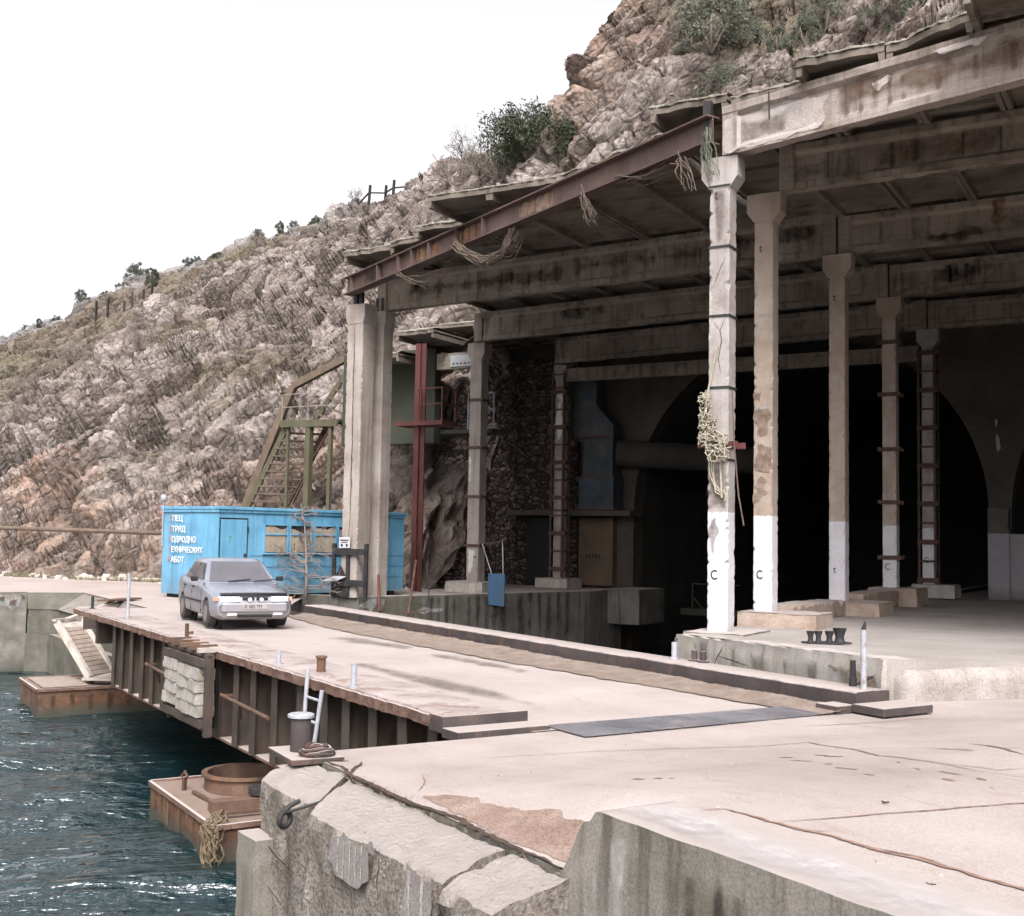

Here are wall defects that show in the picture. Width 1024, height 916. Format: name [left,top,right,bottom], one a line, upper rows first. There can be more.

rust [519,192,553,217]
rust [417,223,479,261]
peeling [753,392,772,505]
crack [736,717,1023,777]
crack [327,760,563,869]
spalling [423,794,584,862]
crack [702,802,1024,890]